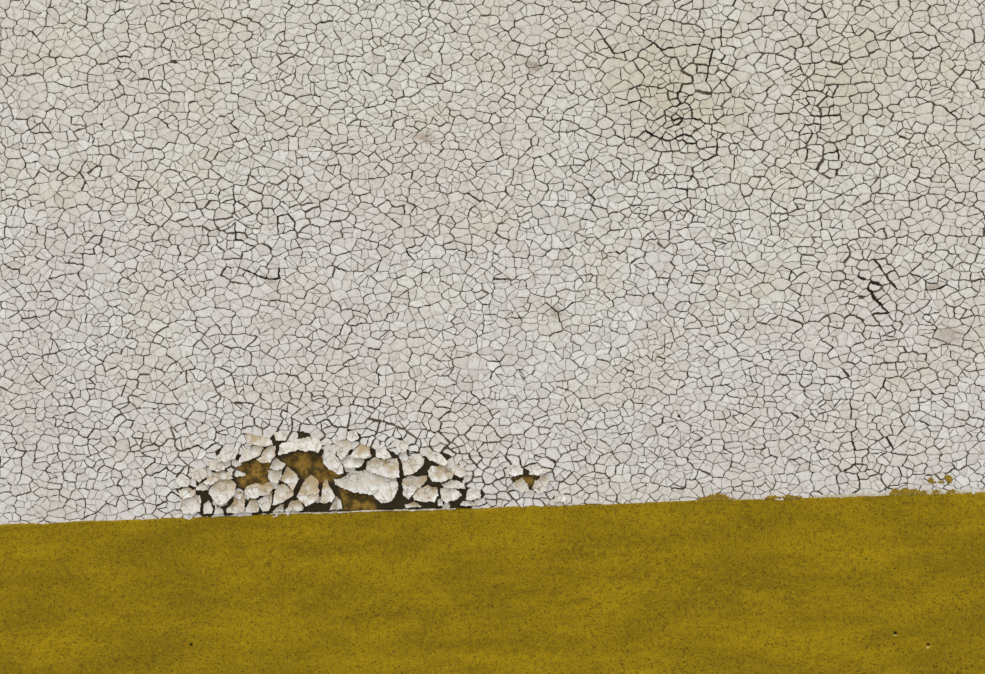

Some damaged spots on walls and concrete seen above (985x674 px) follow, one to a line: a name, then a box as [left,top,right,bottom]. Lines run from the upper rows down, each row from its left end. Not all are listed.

crack [0,0,985,523]
peeling [171,428,487,516]
spalling [503,464,566,502]